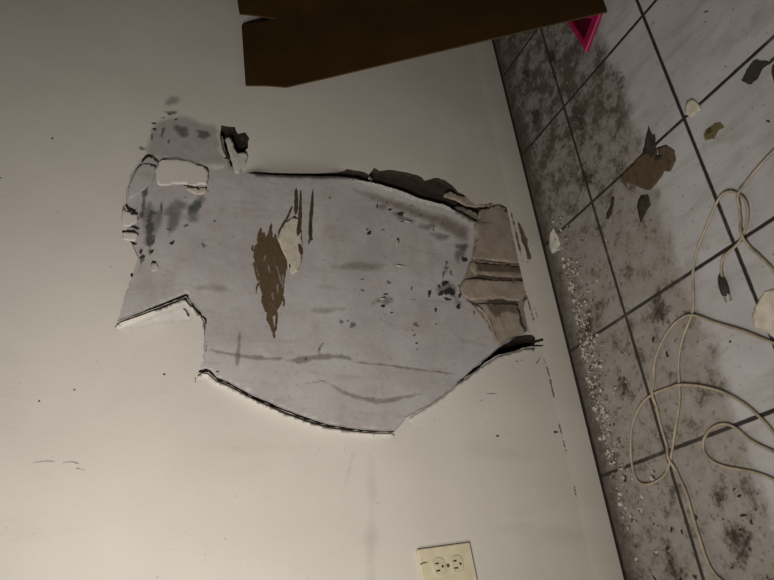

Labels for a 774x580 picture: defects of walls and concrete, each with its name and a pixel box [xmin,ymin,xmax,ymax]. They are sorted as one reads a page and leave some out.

spalling [112,119,543,484]
water stain [704,122,724,140]